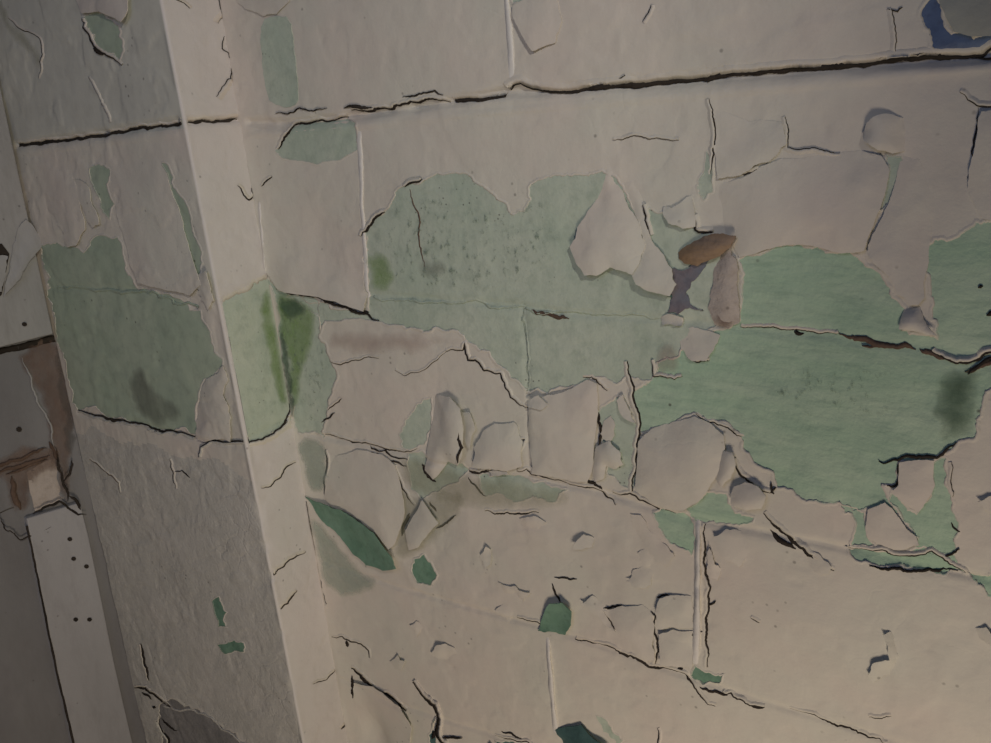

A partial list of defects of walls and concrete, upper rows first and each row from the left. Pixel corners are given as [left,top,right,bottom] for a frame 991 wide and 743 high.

peeling [260,16,298,107]
crack [275,5,991,176]
peeling [916,0,991,62]
crack [287,293,673,408]
peeling [3,110,991,600]
crack [517,357,710,514]
crack [273,397,456,609]
flaking render [153,697,242,743]
peeling [217,639,246,655]
crack [312,634,463,743]
peeling [555,715,625,743]
crack [575,522,765,709]